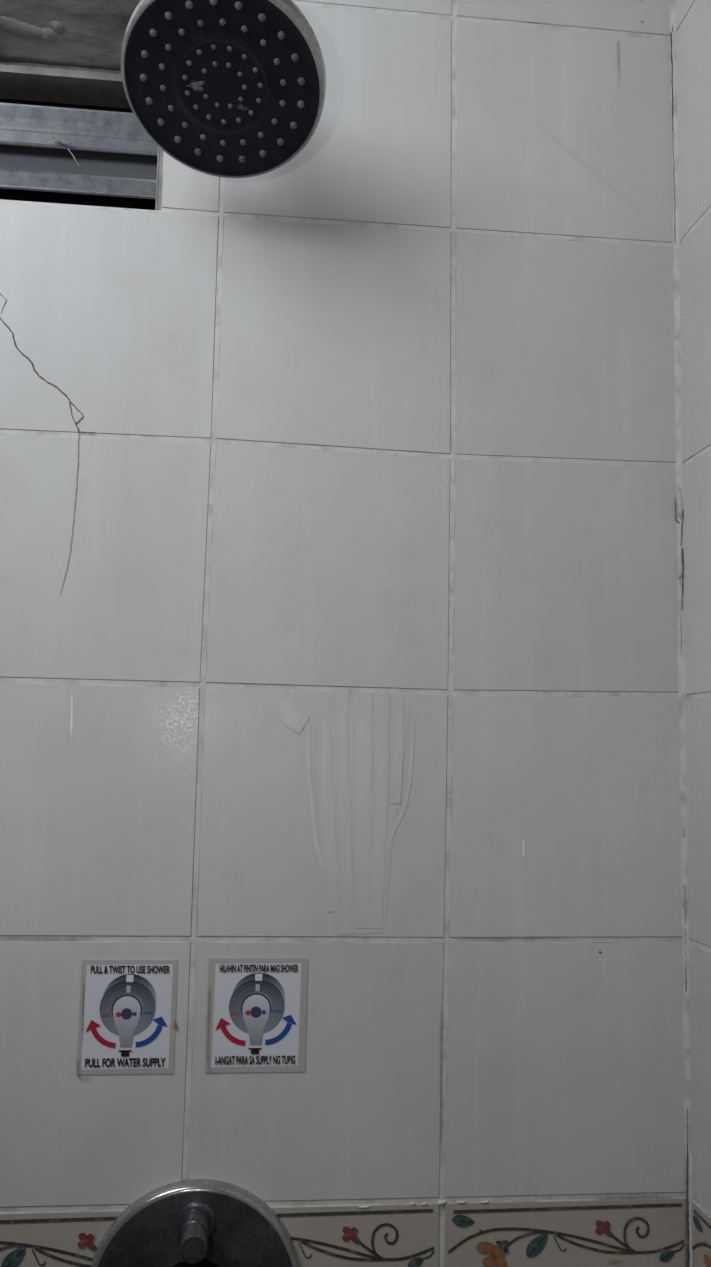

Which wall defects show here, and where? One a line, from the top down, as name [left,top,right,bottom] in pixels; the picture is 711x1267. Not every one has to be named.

crack [0,293,96,593]